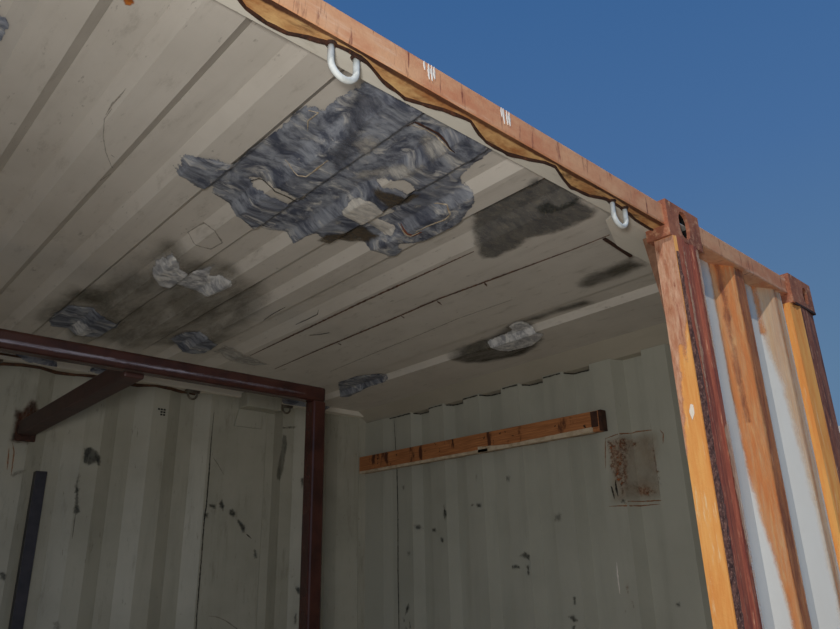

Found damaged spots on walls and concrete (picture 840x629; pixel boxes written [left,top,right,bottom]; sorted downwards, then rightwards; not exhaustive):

rust [243,0,665,229]
peeling [342,198,451,237]
water stain [453,330,535,362]
rust [605,430,661,506]
rust [708,263,840,629]